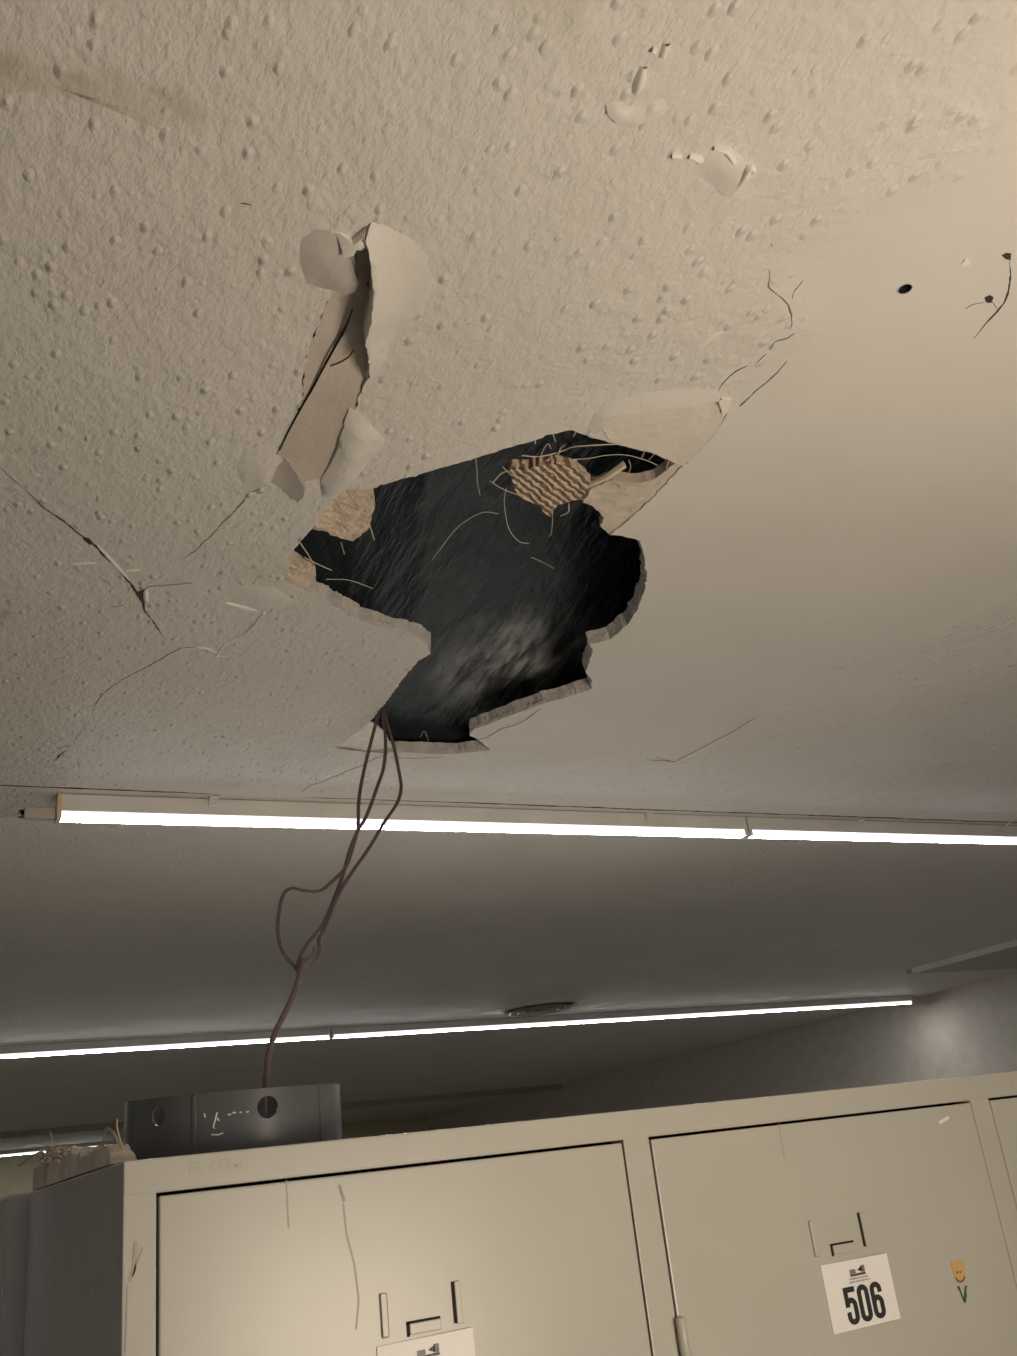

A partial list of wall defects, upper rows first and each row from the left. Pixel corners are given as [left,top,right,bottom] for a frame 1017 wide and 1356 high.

flaking render [236,222,433,503]
crack [718,244,802,406]
crack [0,467,267,794]
spalling [284,581,431,653]
spalling [338,541,647,754]
crack [300,747,1017,823]
crack [653,718,754,764]